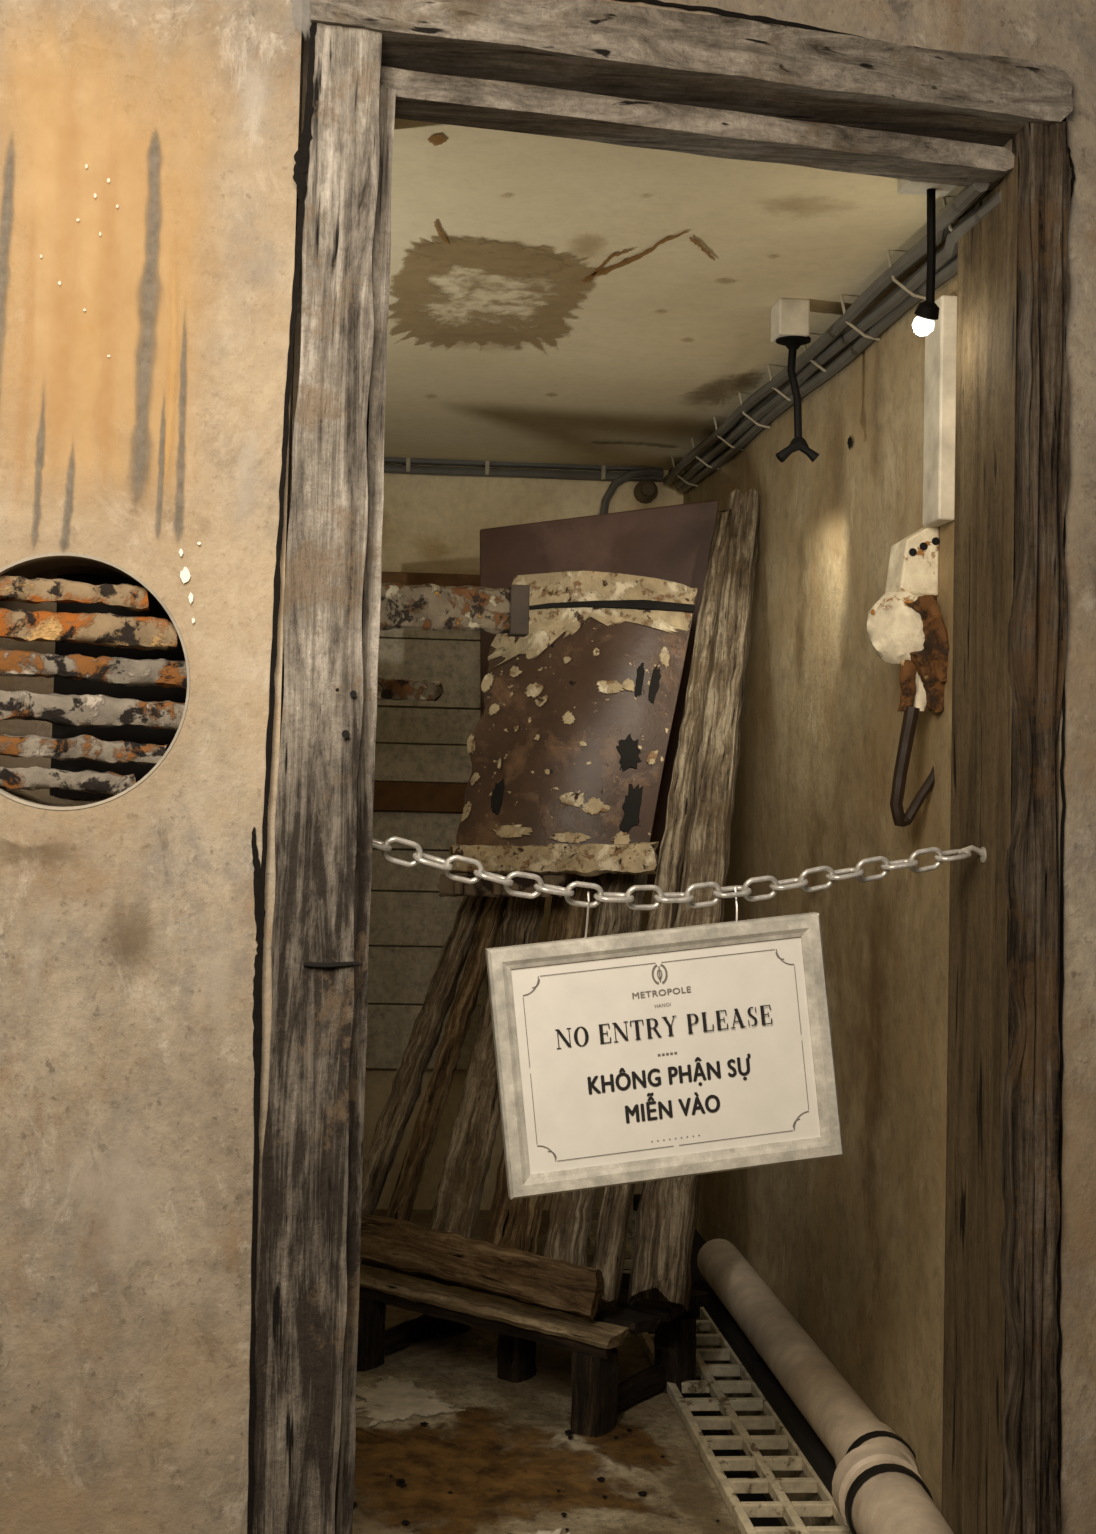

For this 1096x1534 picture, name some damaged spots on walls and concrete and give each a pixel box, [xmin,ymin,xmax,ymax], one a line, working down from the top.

damp [0,150,13,343]
corrosion [6,38,189,469]
crack [689,237,715,260]
damp [133,135,186,537]
damp [33,410,44,541]
damp [61,457,73,548]
spalling [179,542,201,623]